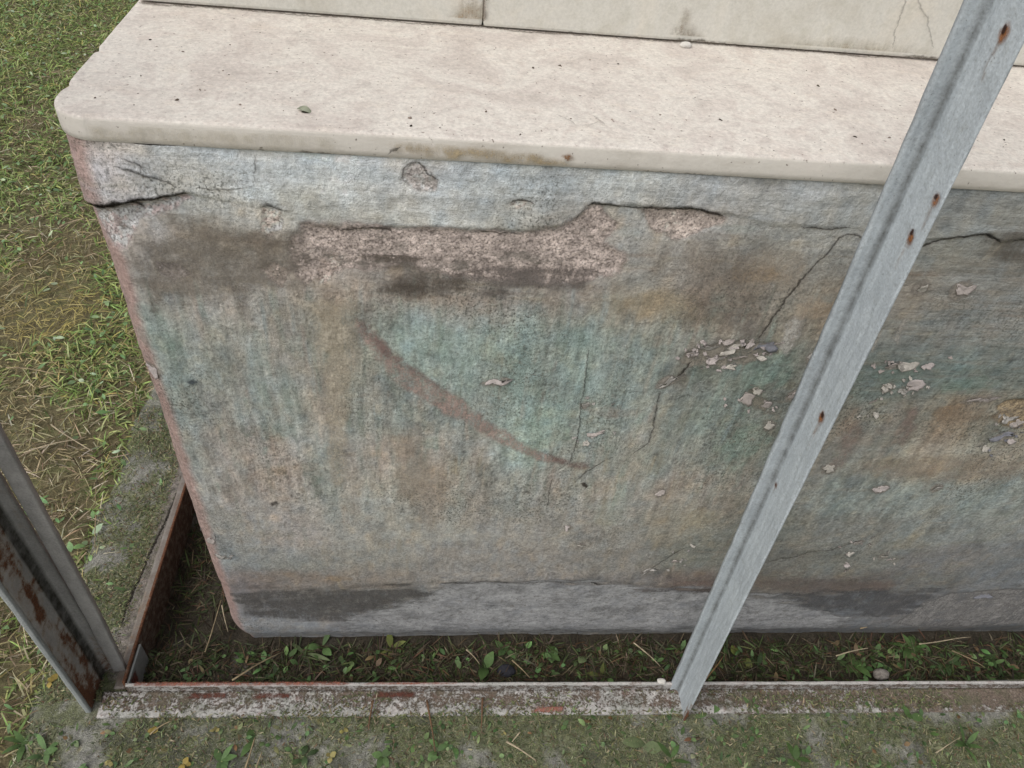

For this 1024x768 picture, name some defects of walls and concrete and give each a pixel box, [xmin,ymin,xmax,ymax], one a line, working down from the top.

crack [84,159,286,211]
flaking render [260,205,626,287]
flaking render [642,208,724,240]
crack [922,233,1023,247]
water stain [362,254,598,296]
crack [758,227,862,339]
peeling [656,339,785,389]
peeling [857,360,935,419]
flaking render [978,399,1024,457]
water stain [232,584,424,621]